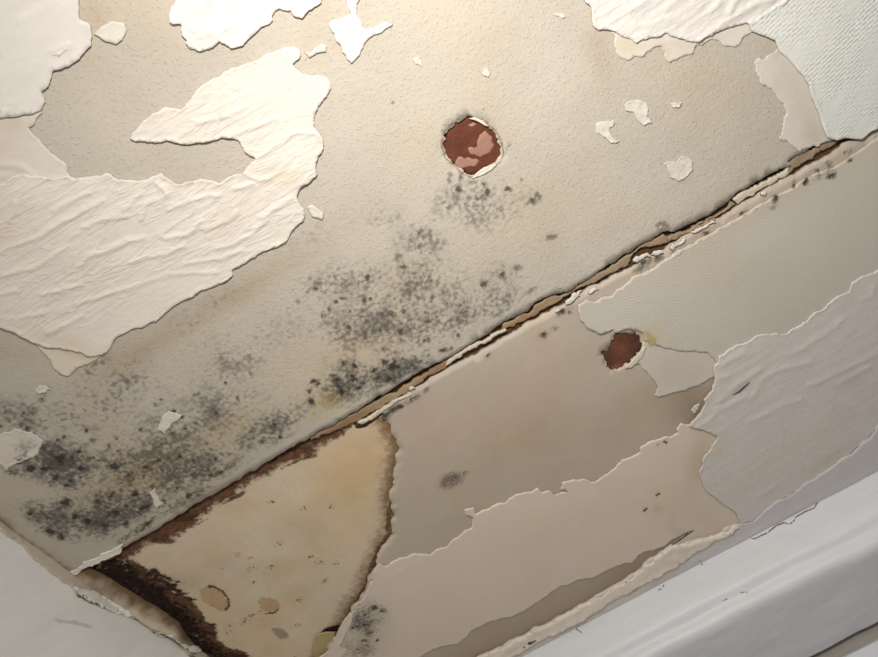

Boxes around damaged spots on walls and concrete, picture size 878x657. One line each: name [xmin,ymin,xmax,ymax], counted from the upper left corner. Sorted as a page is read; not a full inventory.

peeling [329,0,393,63]
peeling [584,0,789,63]
peeling [625,100,652,126]
peeling [754,48,833,152]
peeling [0,0,331,377]
leakage [337,274,474,345]
crack [310,138,850,440]
leakage [308,347,422,404]
peeling [312,270,878,657]
leakage [9,399,352,657]
leakage [321,395,417,655]
crack [751,502,818,539]